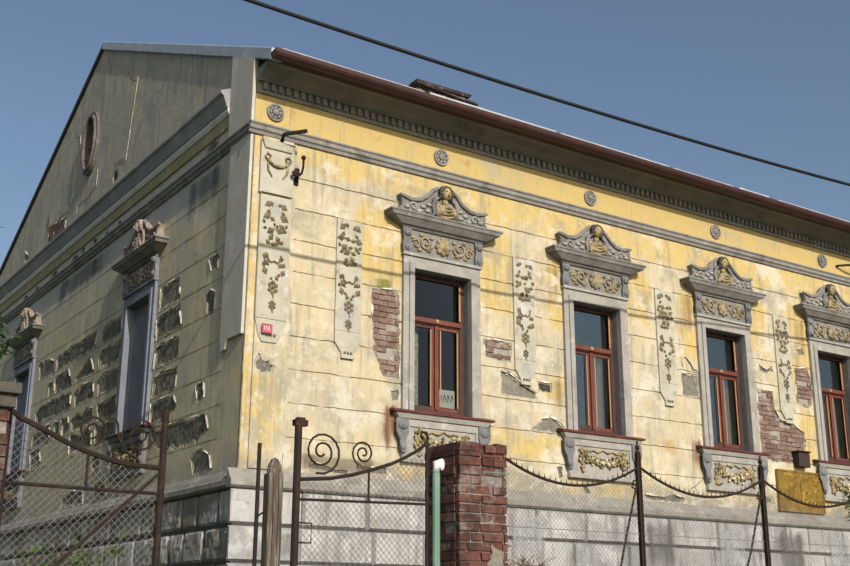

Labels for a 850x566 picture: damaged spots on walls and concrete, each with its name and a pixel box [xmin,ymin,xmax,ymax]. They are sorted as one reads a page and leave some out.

flaking render [48,217,67,243]
spalling [206,288,216,315]
flaking render [368,287,402,380]
peeling [29,315,123,471]
peeling [149,277,212,476]
peeling [483,338,552,399]
peeling [681,372,699,399]
flaking render [756,389,806,463]
peeling [61,490,83,509]